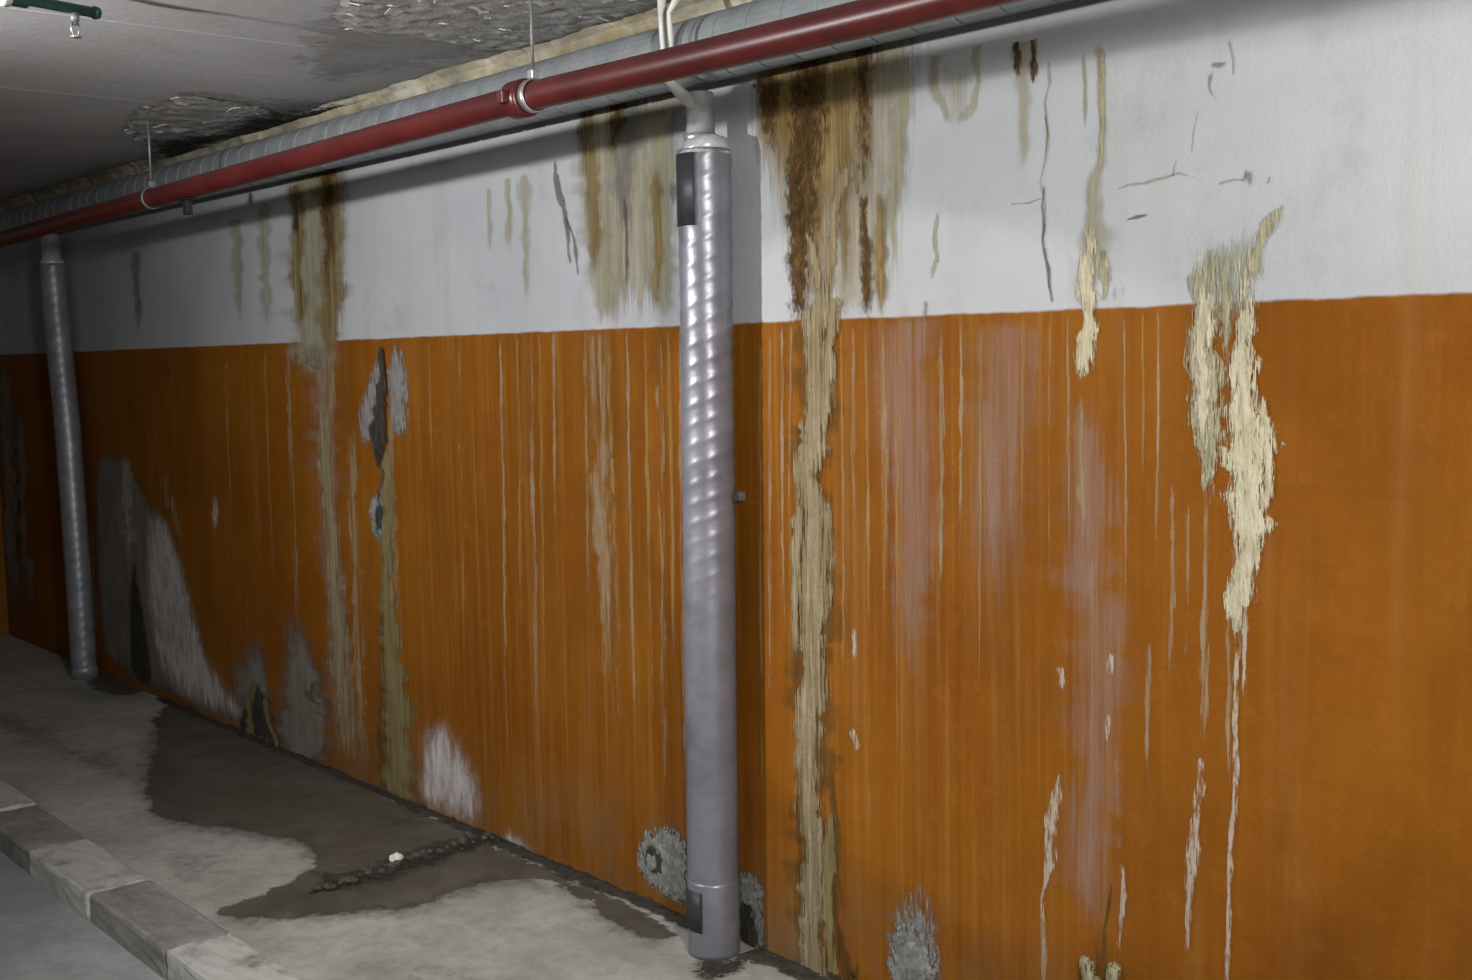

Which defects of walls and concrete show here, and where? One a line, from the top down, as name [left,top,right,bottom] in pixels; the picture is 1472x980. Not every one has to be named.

flaking render [314,0,671,81]
leakage [289,167,346,371]
leakage [577,92,677,314]
crack [1012,62,1053,302]
leakage [1074,49,1110,377]
spalling [359,345,409,466]
peeling [97,456,331,761]
leakage [144,450,686,939]
leakage [760,271,858,980]
leakage [1184,205,1284,980]
spalling [637,826,687,905]
spalling [887,887,941,980]